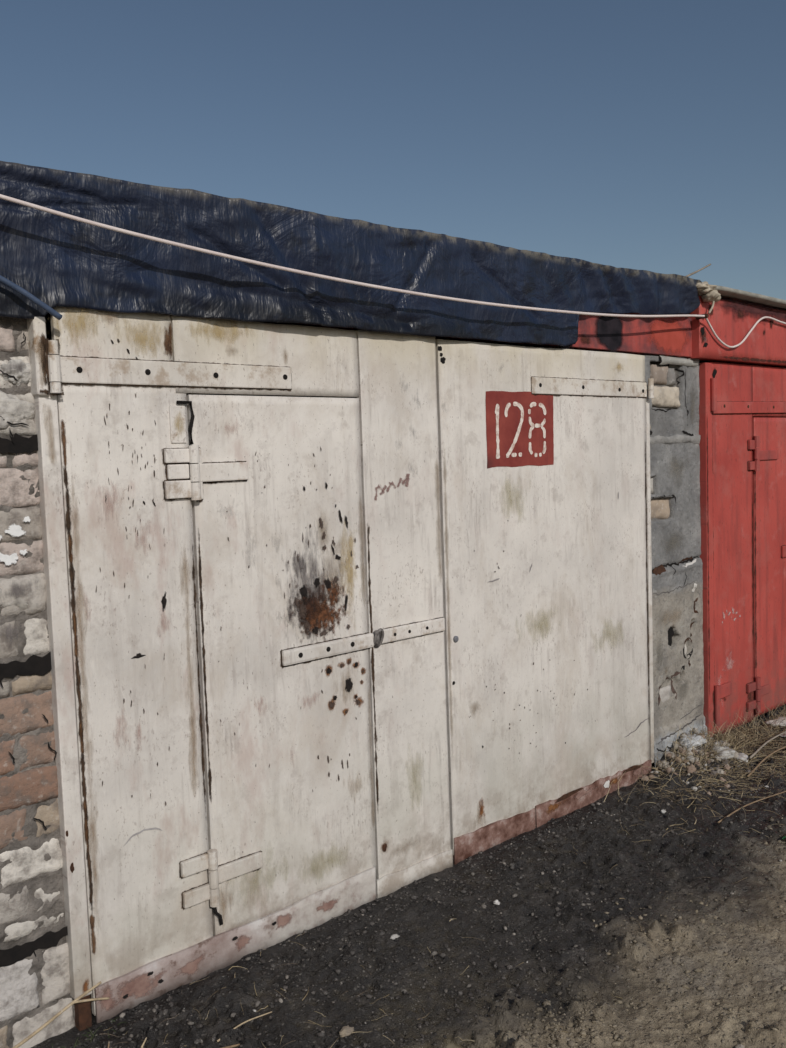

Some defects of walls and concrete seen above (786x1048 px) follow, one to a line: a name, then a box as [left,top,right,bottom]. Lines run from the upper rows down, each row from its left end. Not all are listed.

rust [51,420,96,953]
rust [284,504,373,636]
rust [371,647,379,821]
spalling [658,583,698,706]